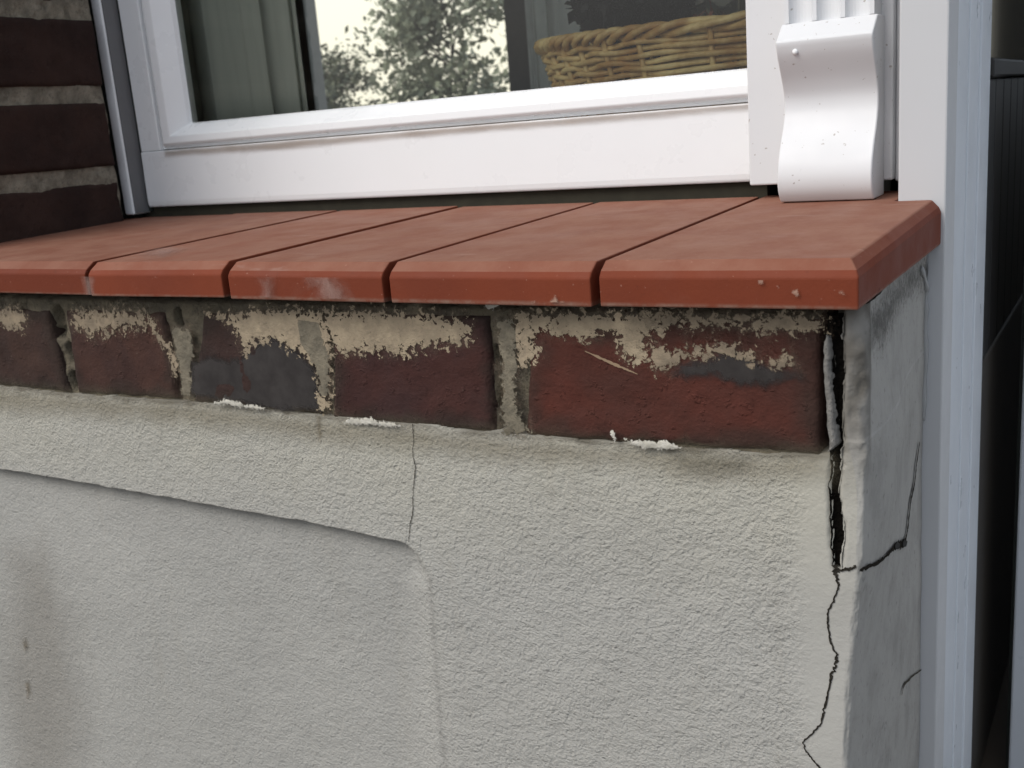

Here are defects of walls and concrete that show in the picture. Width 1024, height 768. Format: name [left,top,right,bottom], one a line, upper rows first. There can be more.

flaking render [0,304,28,336]
flaking render [70,301,195,396]
damp [190,337,322,412]
flaking render [203,302,478,416]
peeling [342,416,401,428]
flaking render [484,298,842,451]
crack [408,424,416,542]
crack [802,313,920,768]